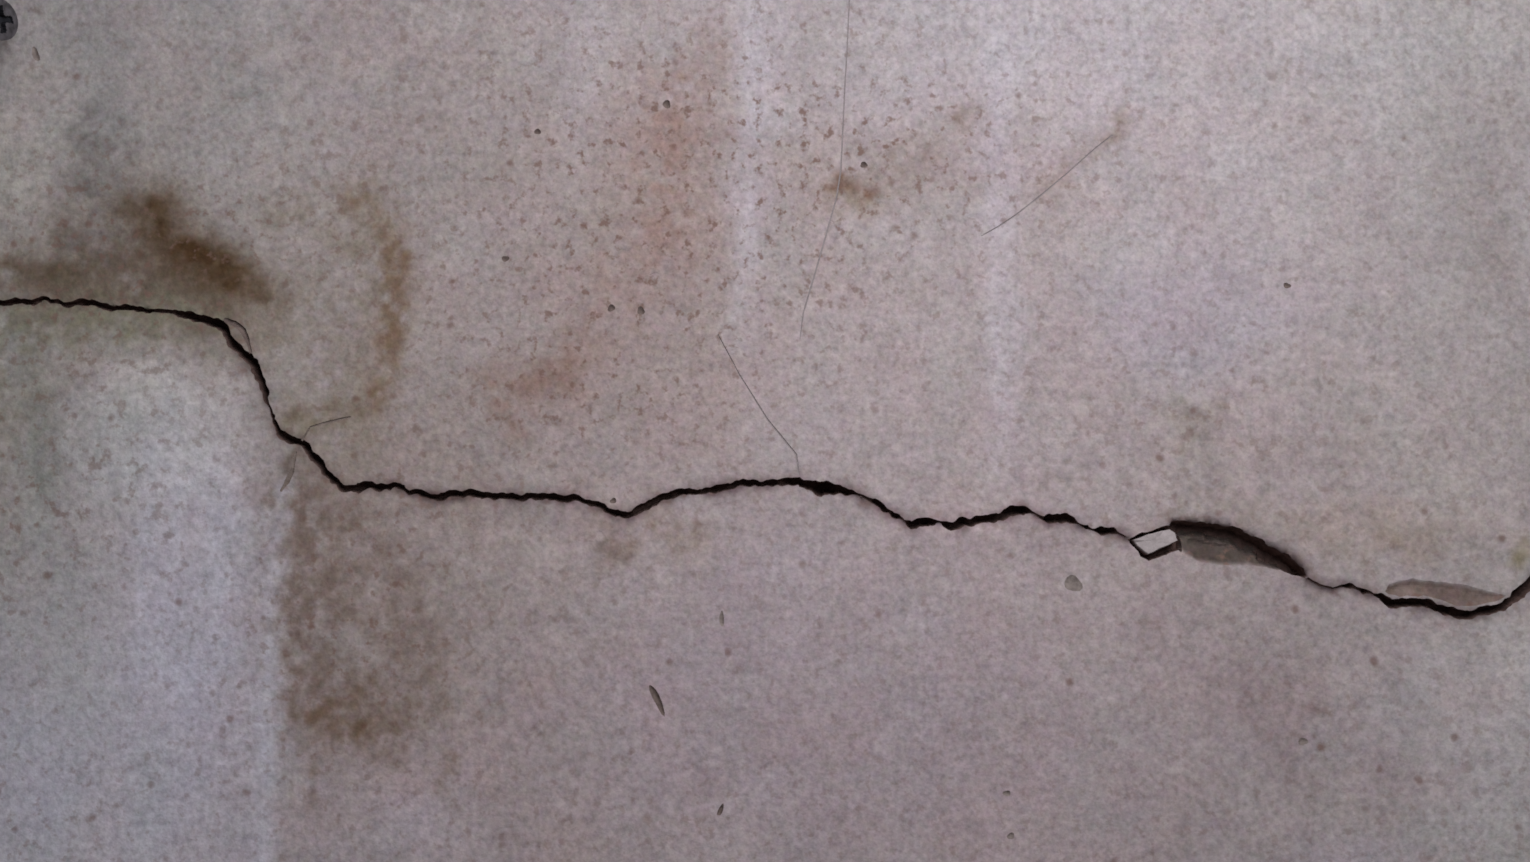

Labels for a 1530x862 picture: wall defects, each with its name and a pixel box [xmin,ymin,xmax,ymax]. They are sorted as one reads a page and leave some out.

damp [0,83,522,821]
crack [0,296,1126,537]
spalling [1127,520,1306,578]
crack [1307,576,1530,620]